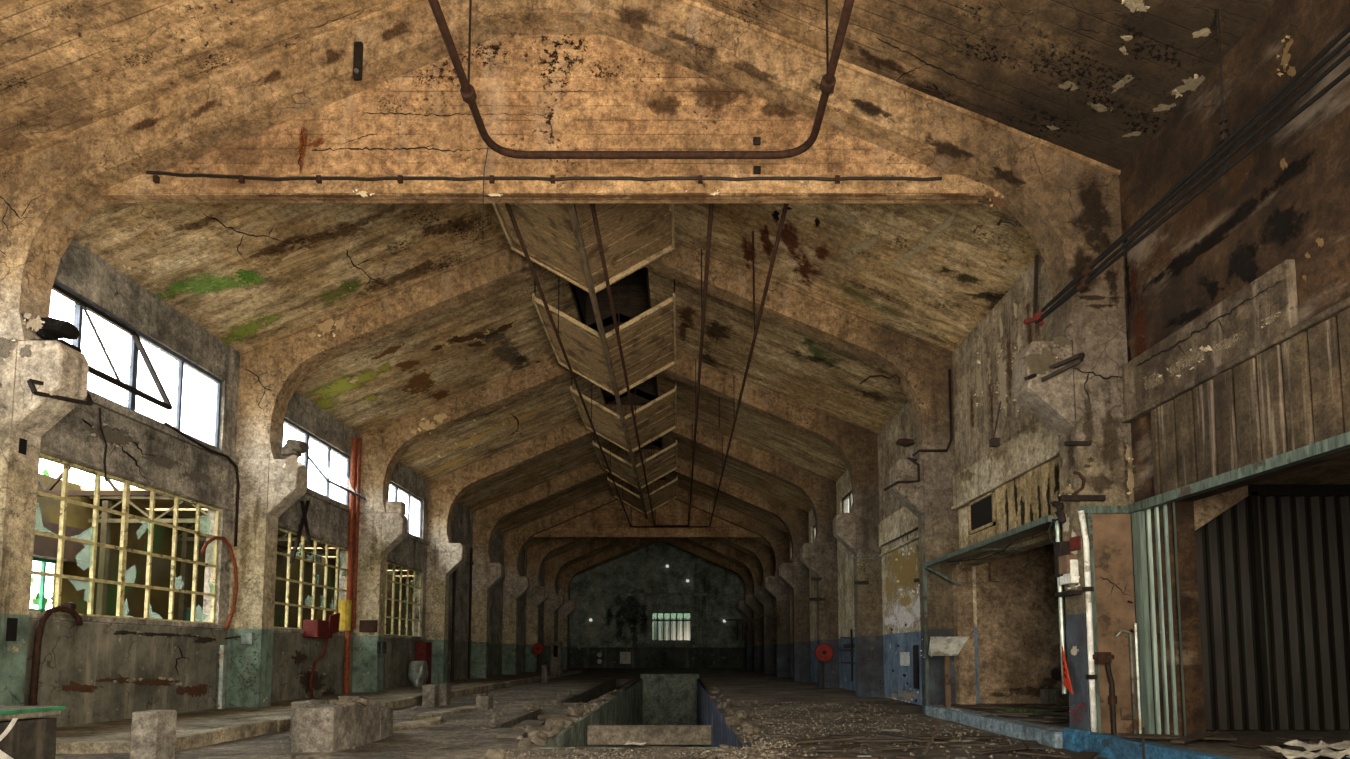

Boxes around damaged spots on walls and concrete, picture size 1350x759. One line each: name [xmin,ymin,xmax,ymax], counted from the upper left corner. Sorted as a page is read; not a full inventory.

spalling [1122,0,1150,13]
spalling [1192,28,1212,38]
water stain [412,42,508,87]
peeling [1277,35,1296,77]
water stain [524,34,623,145]
peeling [1058,81,1079,91]
peeling [1086,74,1135,112]
peeling [1152,74,1205,112]
rust [299,127,324,172]
crack [0,196,39,256]
water stain [1070,153,1313,362]
water stain [481,329,529,370]